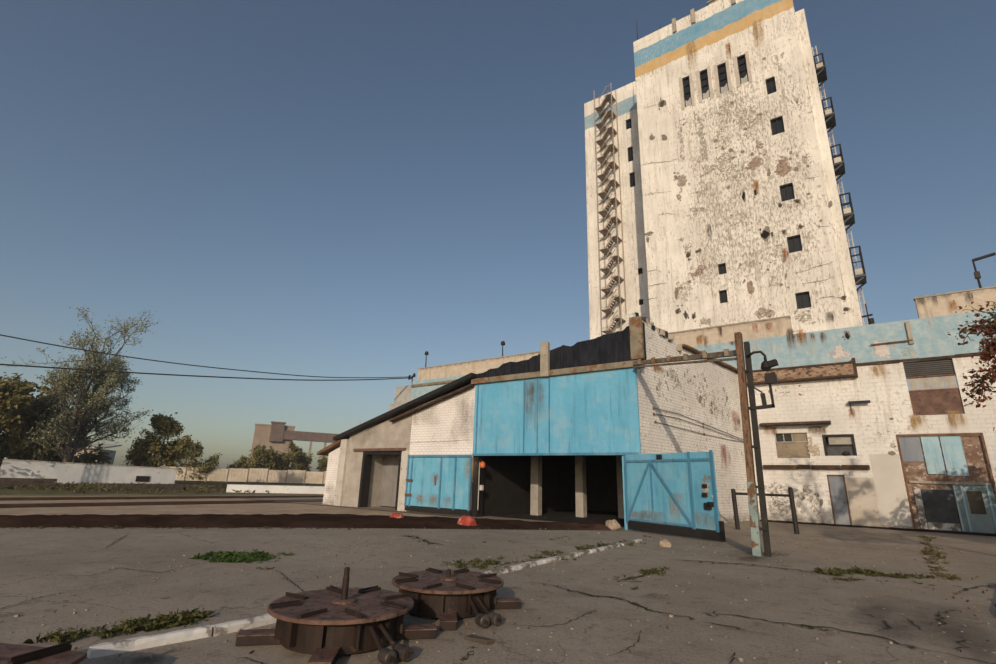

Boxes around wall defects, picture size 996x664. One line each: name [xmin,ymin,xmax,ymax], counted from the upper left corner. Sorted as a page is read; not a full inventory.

peeling [649,99,811,295]
peeling [674,238,712,326]
peeling [754,304,775,319]
peeling [795,307,816,324]
peeling [829,330,851,363]
peeling [872,339,918,359]
peeling [656,368,740,431]
peeling [764,482,823,522]